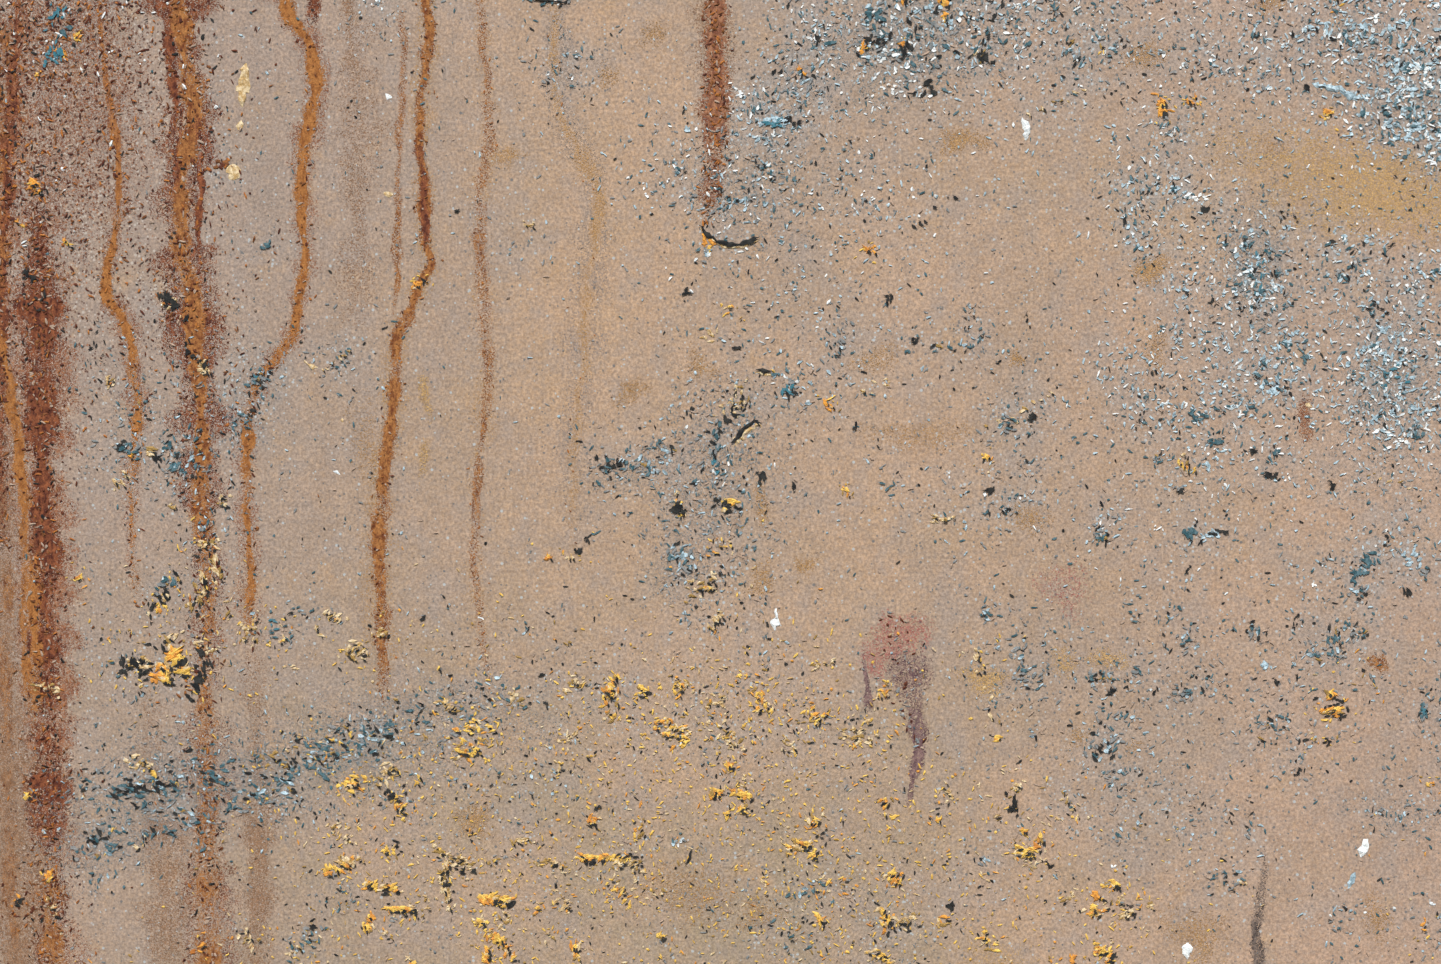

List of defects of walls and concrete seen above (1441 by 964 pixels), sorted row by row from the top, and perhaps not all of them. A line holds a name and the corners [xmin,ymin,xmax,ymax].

corrosion [1128,253,1174,287]
corrosion [0,0,1040,964]
corrosion [981,763,1074,882]
water stain [1249,846,1272,964]
corrosion [1398,906,1441,964]